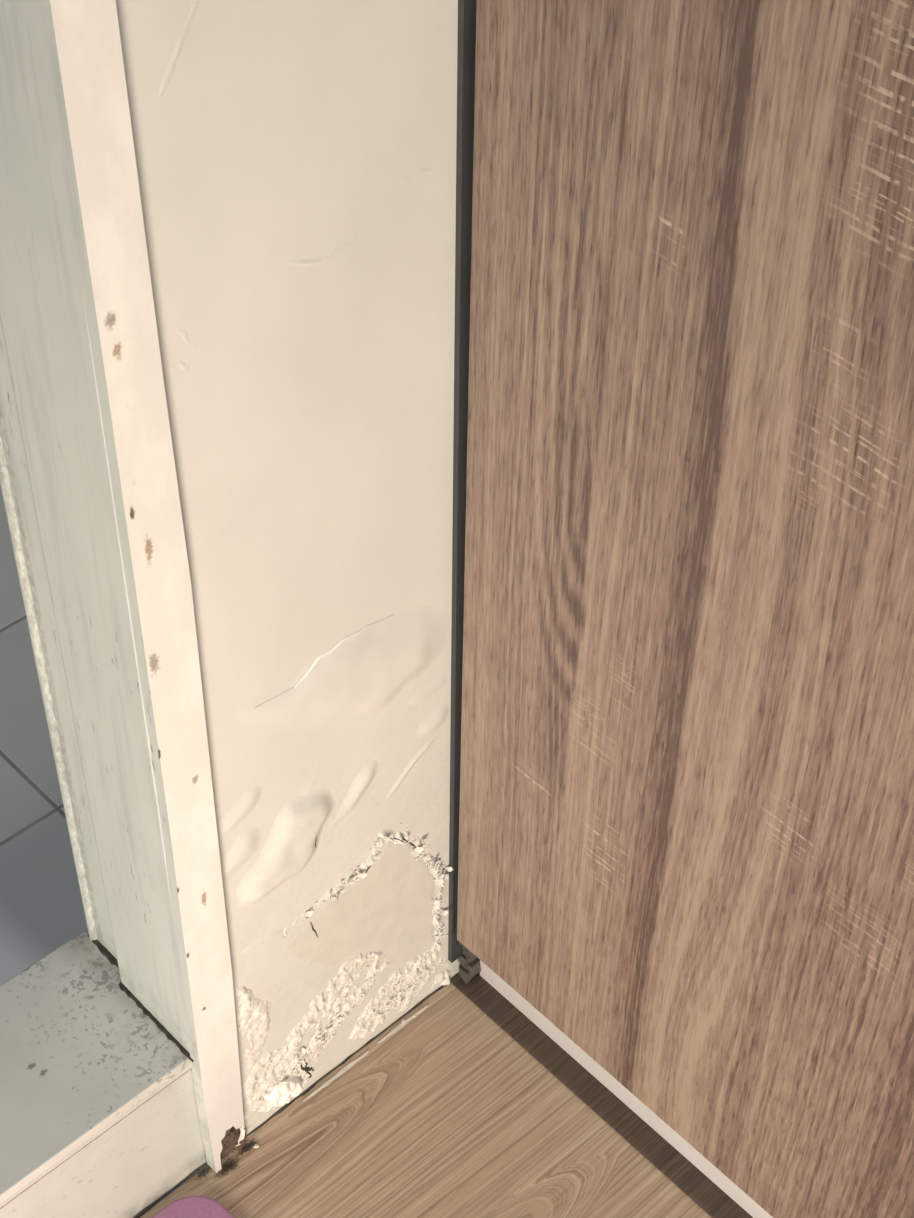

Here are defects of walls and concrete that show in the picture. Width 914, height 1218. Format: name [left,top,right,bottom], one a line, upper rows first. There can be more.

peeling [283,823,454,966]